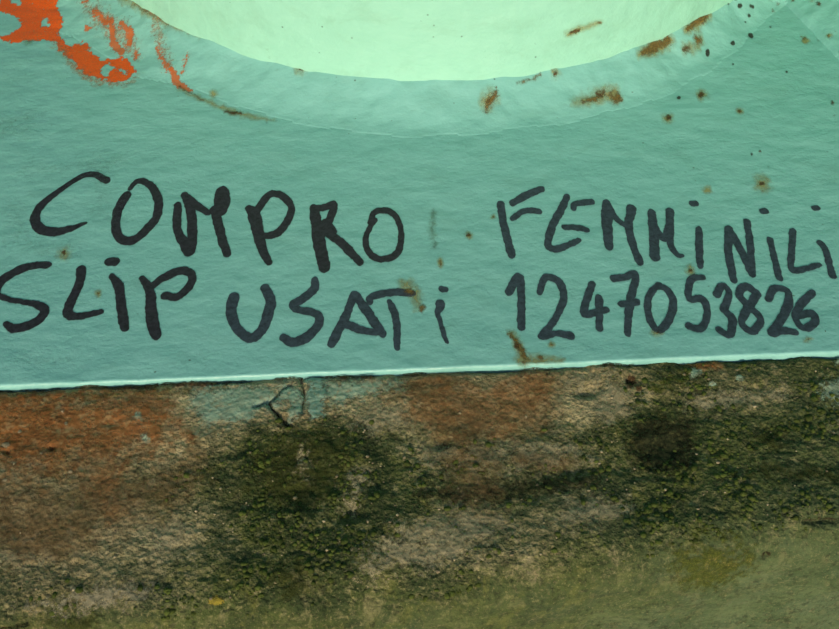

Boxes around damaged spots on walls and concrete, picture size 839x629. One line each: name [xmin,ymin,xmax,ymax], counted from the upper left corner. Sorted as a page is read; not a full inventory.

peeling [0,0,141,87]
rust [638,35,673,56]
rust [682,13,711,52]
rust [180,86,264,119]
rust [482,87,498,113]
rust [581,89,623,104]
damp [280,378,409,441]
damp [686,382,790,409]
rust [0,388,193,502]
damp [337,468,367,517]
damp [355,430,633,580]
damp [25,578,155,619]